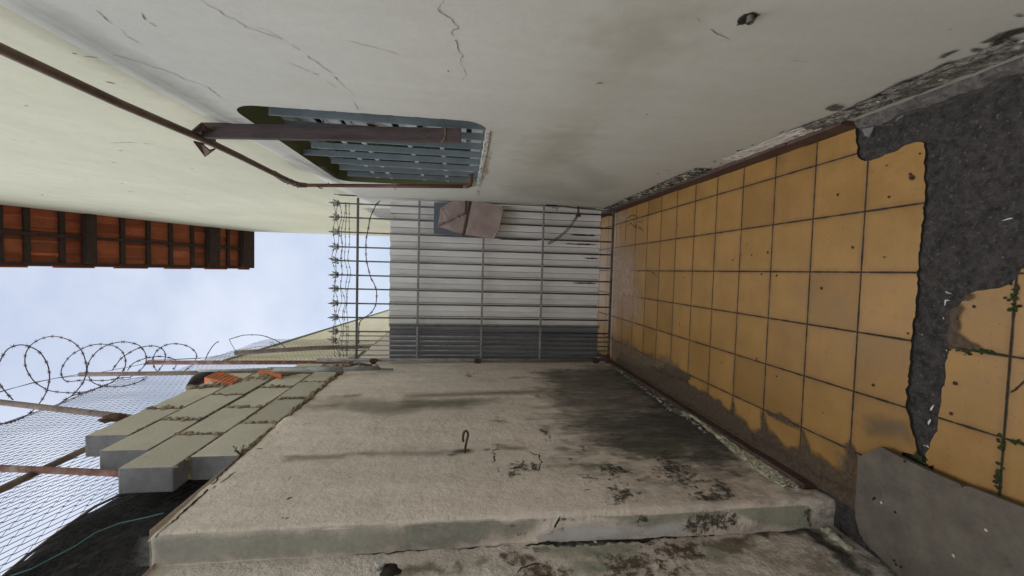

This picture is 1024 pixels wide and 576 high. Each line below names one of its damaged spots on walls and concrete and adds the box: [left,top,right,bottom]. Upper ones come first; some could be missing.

crack [92,12,220,97]
crack [437,0,467,80]
flaking render [603,38,1024,209]
leakage [555,371,731,463]
crack [356,548,428,556]